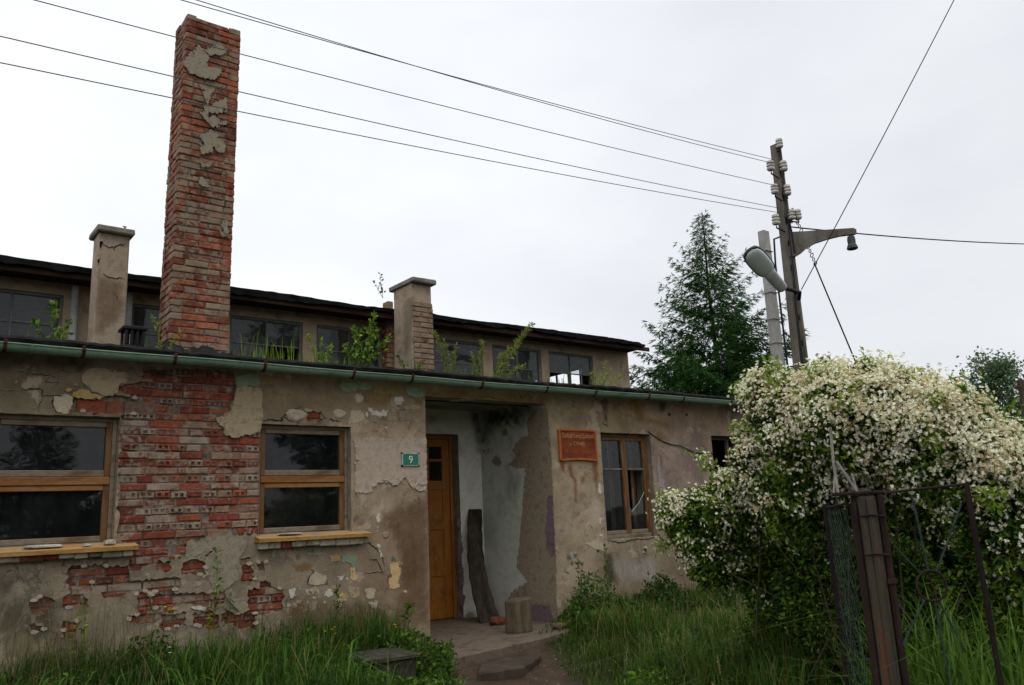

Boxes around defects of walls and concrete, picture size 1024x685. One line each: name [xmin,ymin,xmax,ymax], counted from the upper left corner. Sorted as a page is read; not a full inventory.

peeling [182,43,230,188]
crack [102,243,128,301]
spalling [27,367,378,639]
peeling [376,544,407,593]